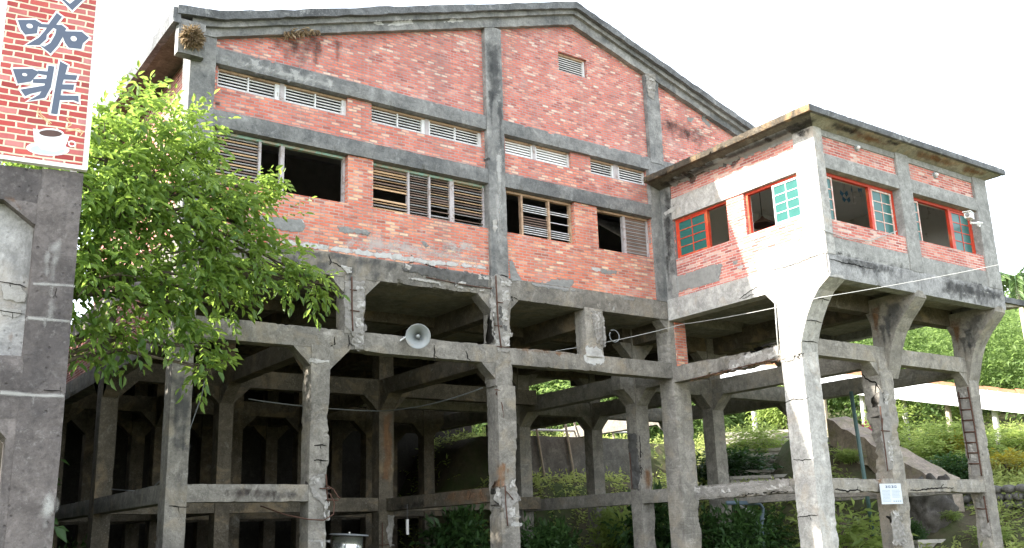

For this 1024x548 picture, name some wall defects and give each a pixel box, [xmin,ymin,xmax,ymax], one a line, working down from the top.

spalling [271,240,513,353]
leakage [946,281,1000,298]
spalling [584,310,606,365]
spalling [305,474,339,521]
spalling [491,479,521,527]
spalling [886,510,907,548]